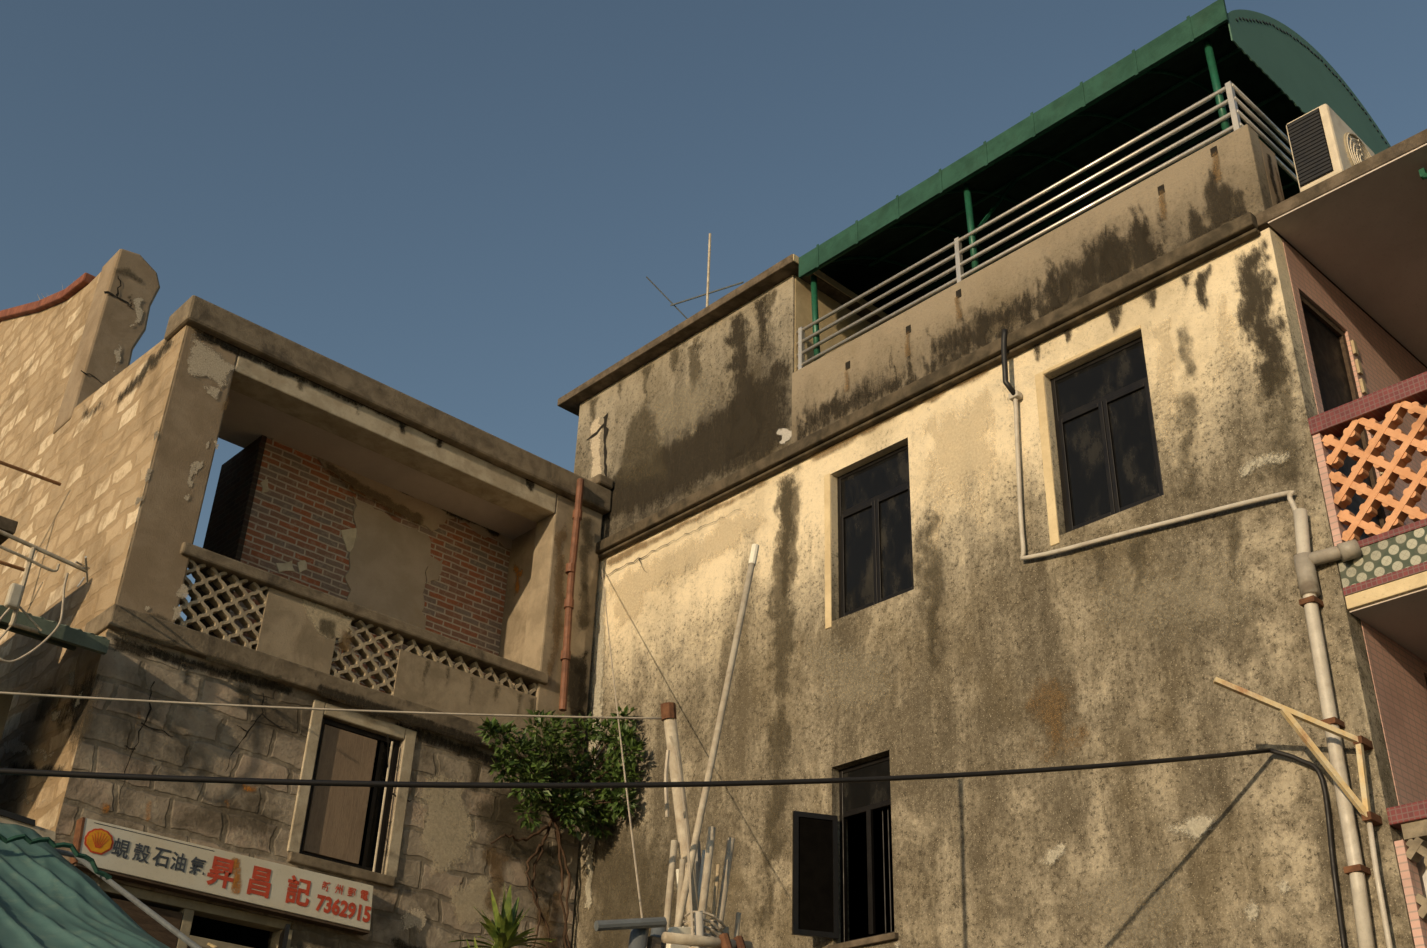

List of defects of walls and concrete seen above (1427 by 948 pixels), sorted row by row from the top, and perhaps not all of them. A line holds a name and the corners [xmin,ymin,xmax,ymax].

water stain [1187,168,1247,242]
crack [104,276,133,309]
peeling [187,334,236,410]
water stain [1151,317,1196,493]
water stain [1182,241,1297,481]
water stain [547,207,1165,765]
peeling [276,560,307,573]
peeling [303,455,499,650]
crack [119,681,173,798]
water stain [572,776,676,948]
water stain [1040,843,1065,864]
water stain [1170,815,1215,839]